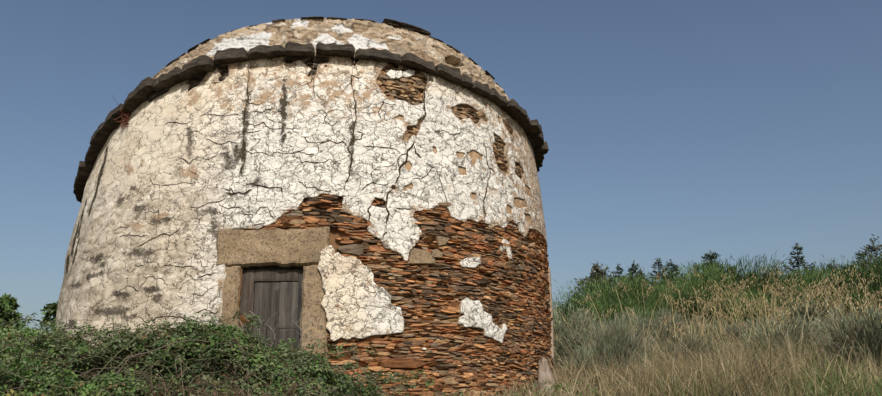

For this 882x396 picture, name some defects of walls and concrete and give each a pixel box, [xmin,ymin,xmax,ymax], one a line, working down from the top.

spalling [376,64,427,142]
spalling [451,103,487,124]
crack [115,65,462,323]
crack [483,143,495,219]
spalling [241,135,554,396]